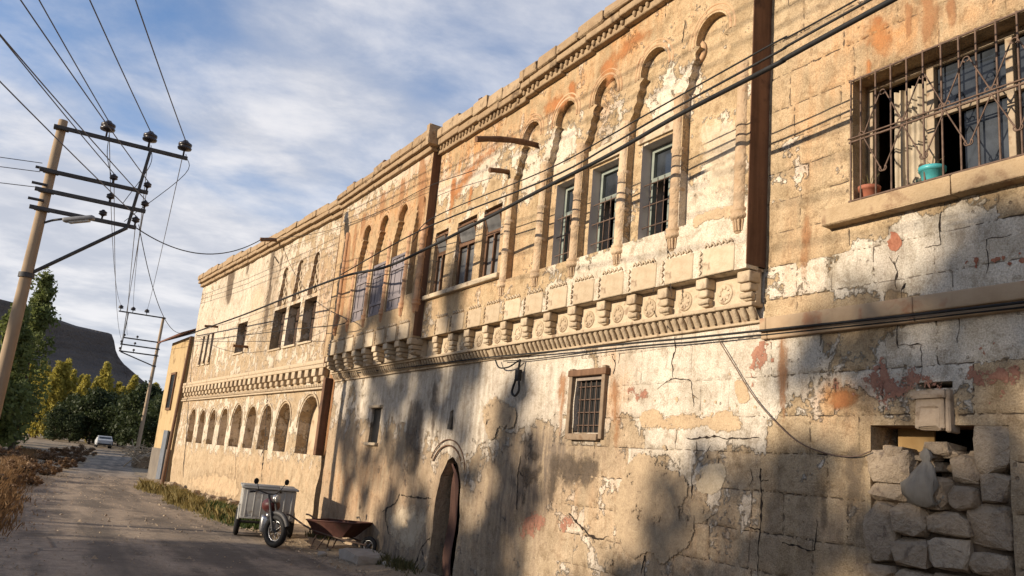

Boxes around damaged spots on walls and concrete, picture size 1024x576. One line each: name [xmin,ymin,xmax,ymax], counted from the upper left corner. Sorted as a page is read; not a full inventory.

spalling [887,232,902,251]
crack [889,255,906,298]
crack [929,211,942,247]
spalling [965,252,1024,268]
crack [653,239,698,407]
peeling [848,356,943,410]
crack [687,435,759,497]
crack [568,513,607,543]